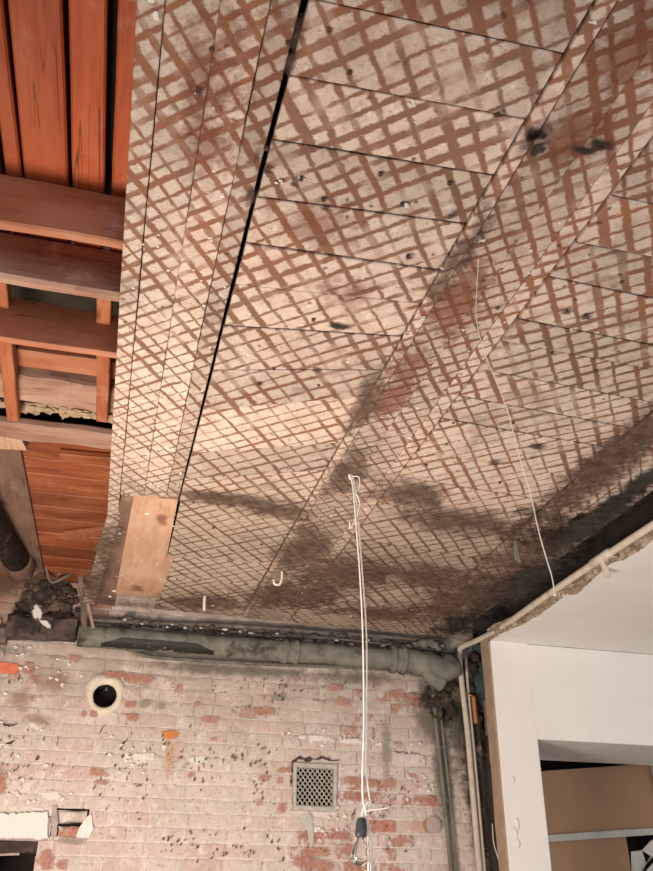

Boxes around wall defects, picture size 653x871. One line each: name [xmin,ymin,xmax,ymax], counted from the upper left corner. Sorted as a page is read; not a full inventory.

leakage [428,205,493,299]
leakage [345,376,383,436]
leakage [83,413,653,637]
spalling [487,530,653,640]
peeling [0,646,80,695]
spalling [78,671,152,721]
spalling [0,729,94,838]
peeling [72,735,291,805]